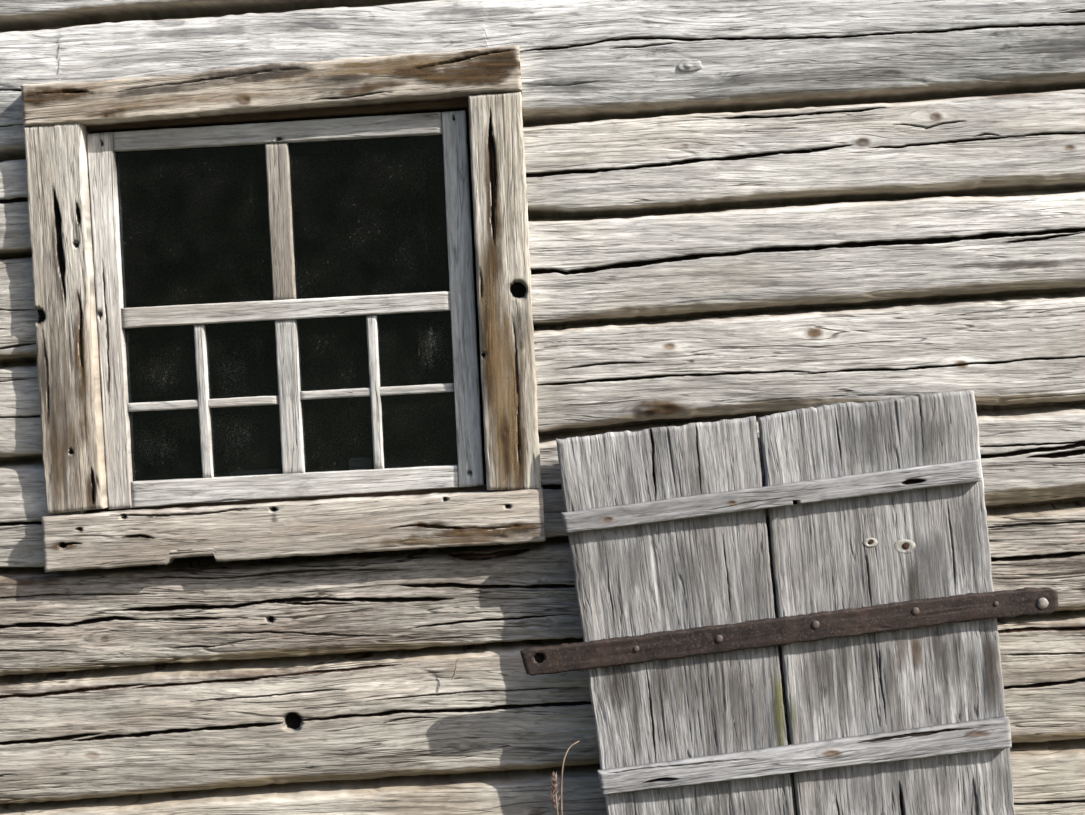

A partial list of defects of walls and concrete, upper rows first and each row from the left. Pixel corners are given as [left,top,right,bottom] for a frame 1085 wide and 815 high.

crack [526,107,1085,178]
crack [479,106,496,299]
crack [530,228,1085,275]
crack [512,312,1085,385]
crack [981,441,1085,458]
crack [0,524,575,652]
crack [0,664,592,745]
crack [634,662,675,815]